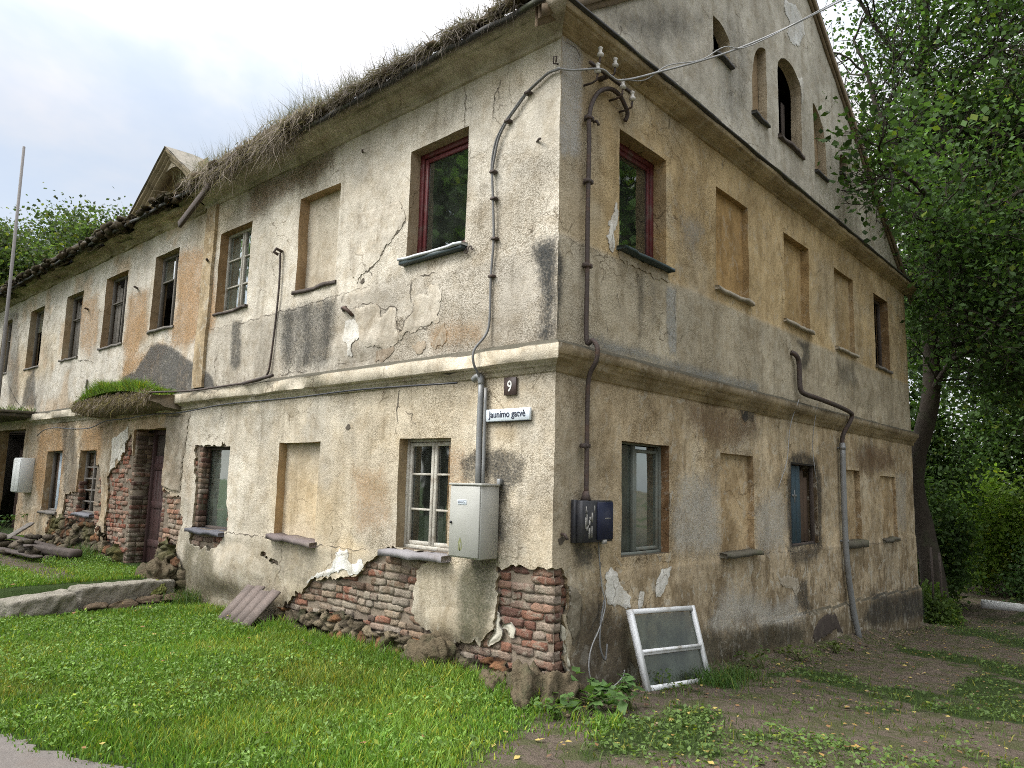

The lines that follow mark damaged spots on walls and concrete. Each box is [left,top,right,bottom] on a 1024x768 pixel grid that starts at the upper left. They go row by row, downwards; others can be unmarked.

peeling [784,0,805,47]
crack [180,224,441,337]
peeling [343,283,448,362]
leakage [532,239,563,338]
peeling [606,202,669,283]
spalling [64,427,138,562]
peeling [161,414,230,554]
spalling [285,547,448,639]
spalling [456,565,583,673]
peeling [605,566,672,609]
leakage [660,583,809,670]